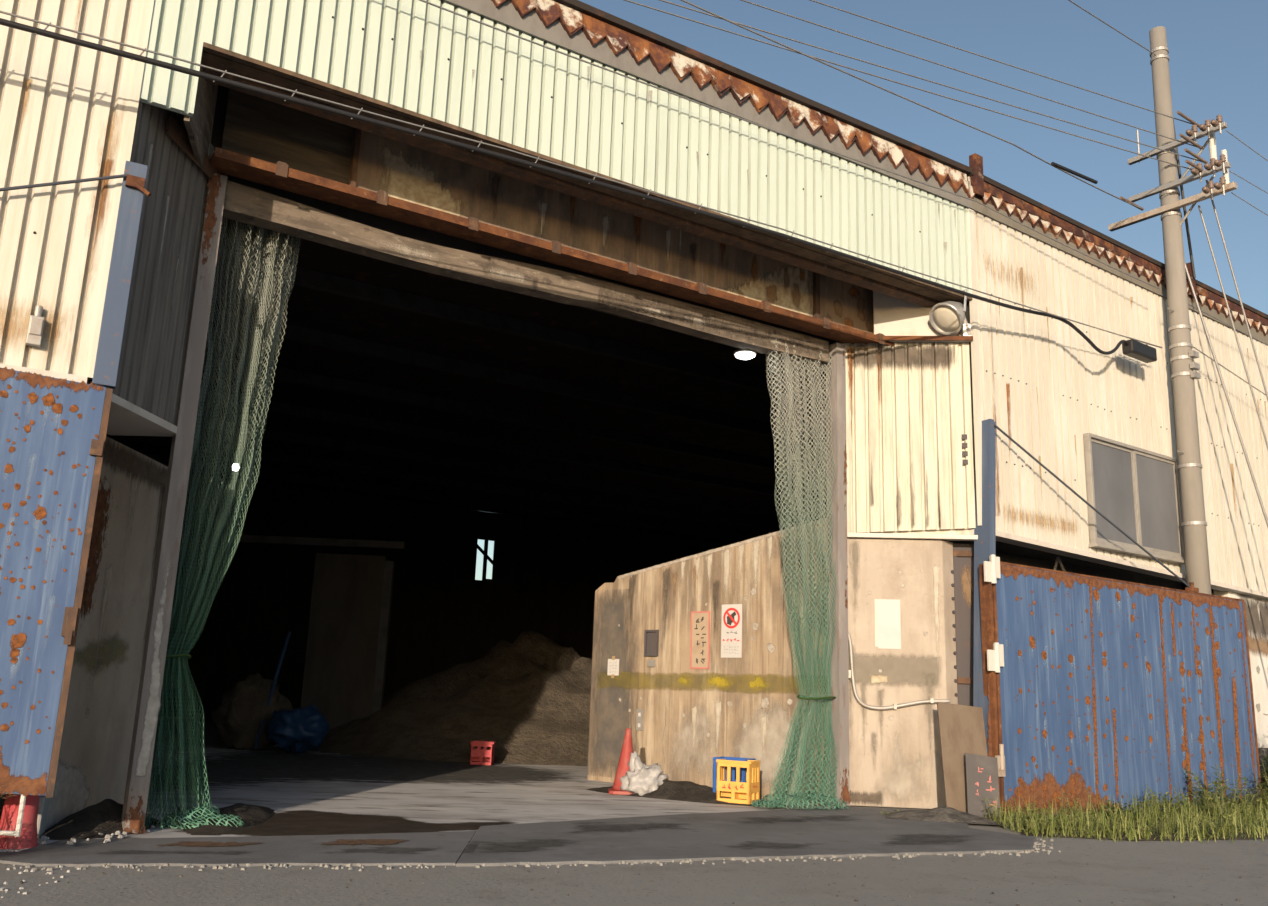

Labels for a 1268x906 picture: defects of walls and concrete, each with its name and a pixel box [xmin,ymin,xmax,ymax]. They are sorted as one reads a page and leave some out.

corrosion [93,121,114,249]
corrosion [202,172,221,265]
corrosion [0,367,113,618]
corrosion [7,615,54,674]
corrosion [0,679,22,731]
corrosion [0,746,48,796]